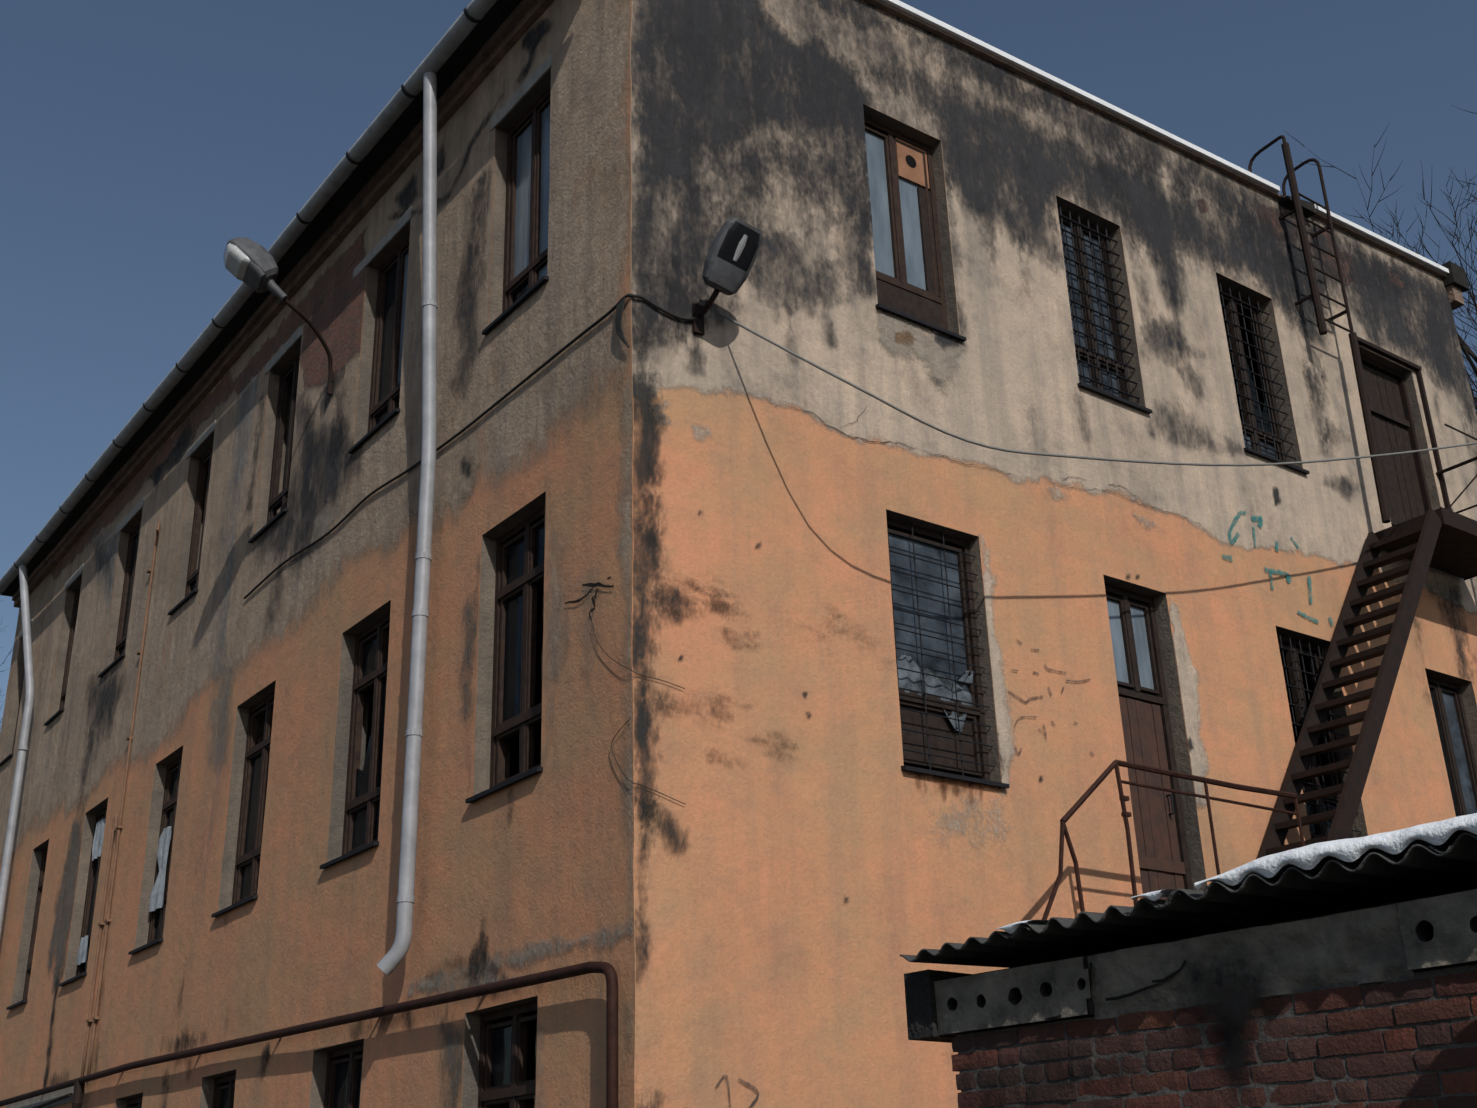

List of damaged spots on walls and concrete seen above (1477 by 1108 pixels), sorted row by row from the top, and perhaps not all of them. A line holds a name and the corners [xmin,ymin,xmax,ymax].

water stain [453,172,489,385]
water stain [631,0,1477,423]
water stain [259,397,356,563]
peeling [433,0,1477,897]
water stain [1332,476,1353,496]
peeling [0,150,423,992]
water stain [82,672,120,780]
water stain [461,604,477,716]
water stain [640,801,685,851]